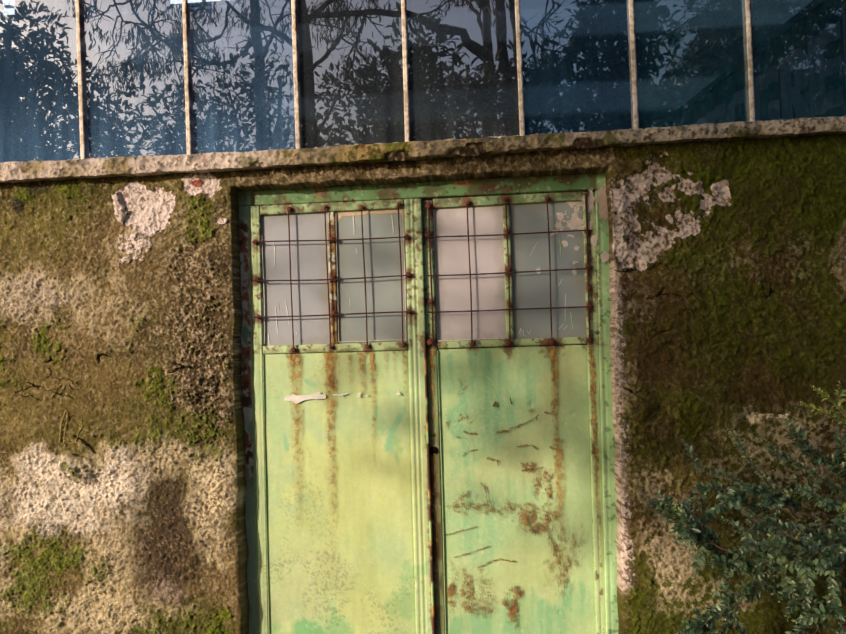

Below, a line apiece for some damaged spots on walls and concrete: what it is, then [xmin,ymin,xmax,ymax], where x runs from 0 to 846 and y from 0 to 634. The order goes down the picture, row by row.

flaking render [111,181,176,266]
flaking render [181,173,222,198]
flaking render [609,150,731,271]
rust [289,354,301,460]
rust [324,353,337,457]
rust [453,347,576,588]
rust [589,347,599,504]
leakage [0,446,228,601]
rust [447,570,523,628]